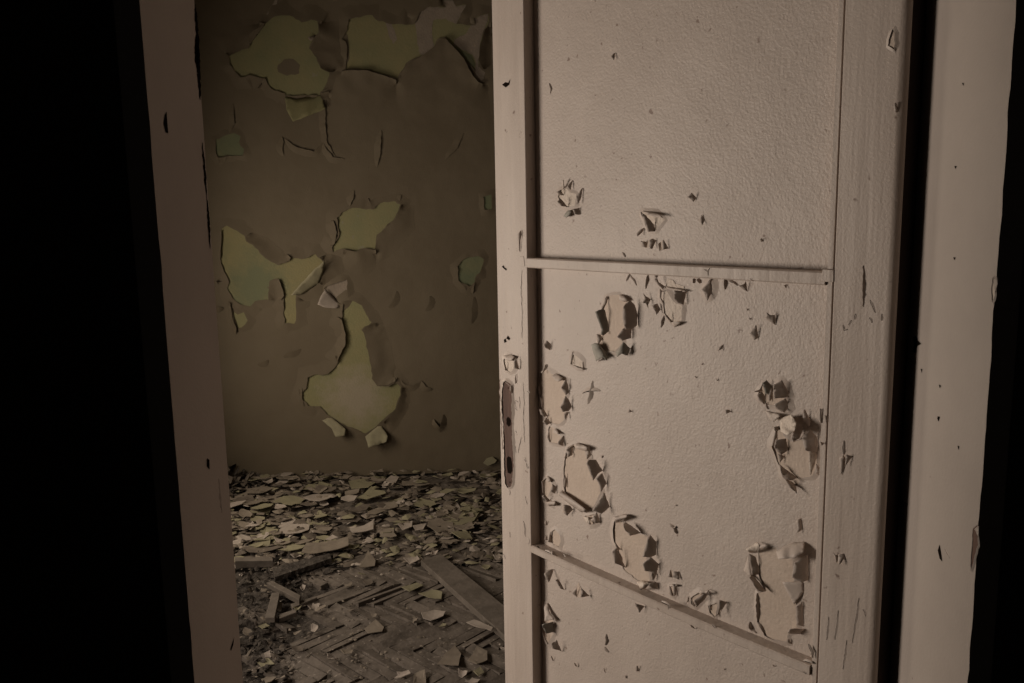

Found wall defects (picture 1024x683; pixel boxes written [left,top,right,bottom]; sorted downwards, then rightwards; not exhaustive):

peeling [206,0,510,153]
peeling [556,180,583,218]
peeling [636,208,669,251]
peeling [211,194,415,448]
peeling [537,275,727,619]
peeling [753,375,828,494]
peeling [541,601,561,661]
peeling [744,518,808,646]